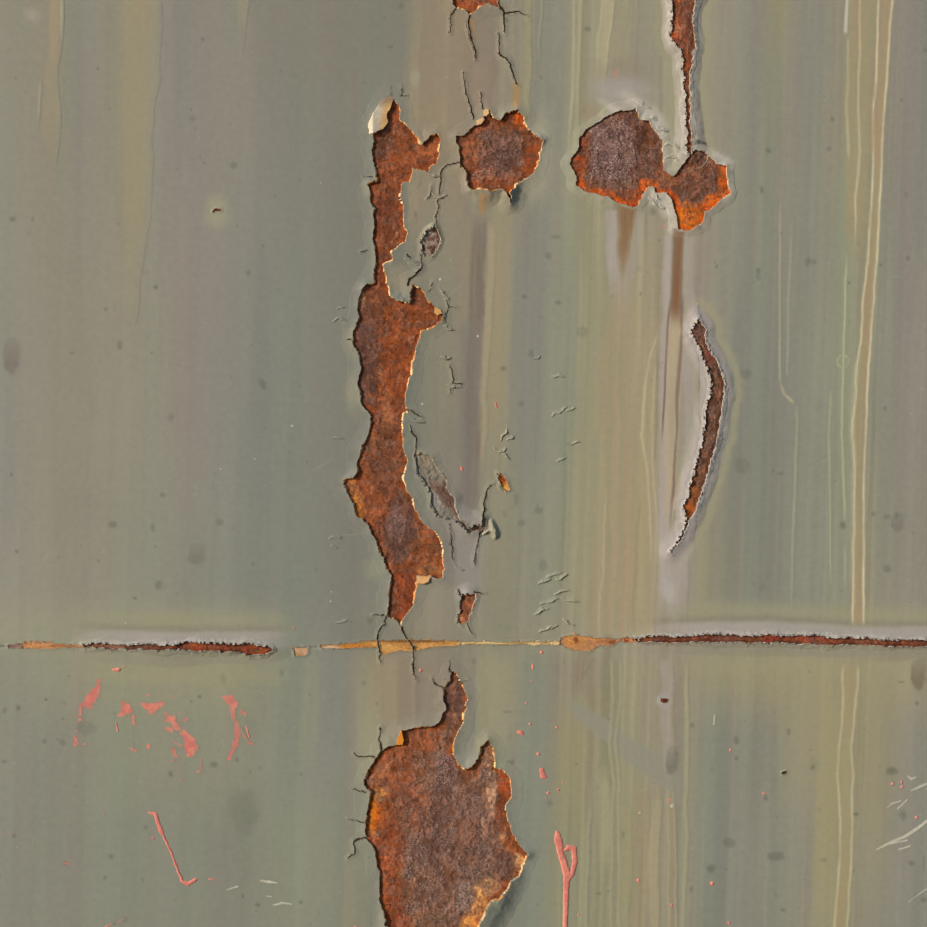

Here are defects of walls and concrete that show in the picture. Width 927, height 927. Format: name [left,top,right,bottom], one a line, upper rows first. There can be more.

corrosion [438,0,515,37]
crack [446,0,531,121]
corrosion [330,80,552,637]
corrosion [561,98,738,621]
peeling [412,448,492,540]
crack [79,635,277,661]
crack [633,629,927,651]
corrosion [352,660,541,927]